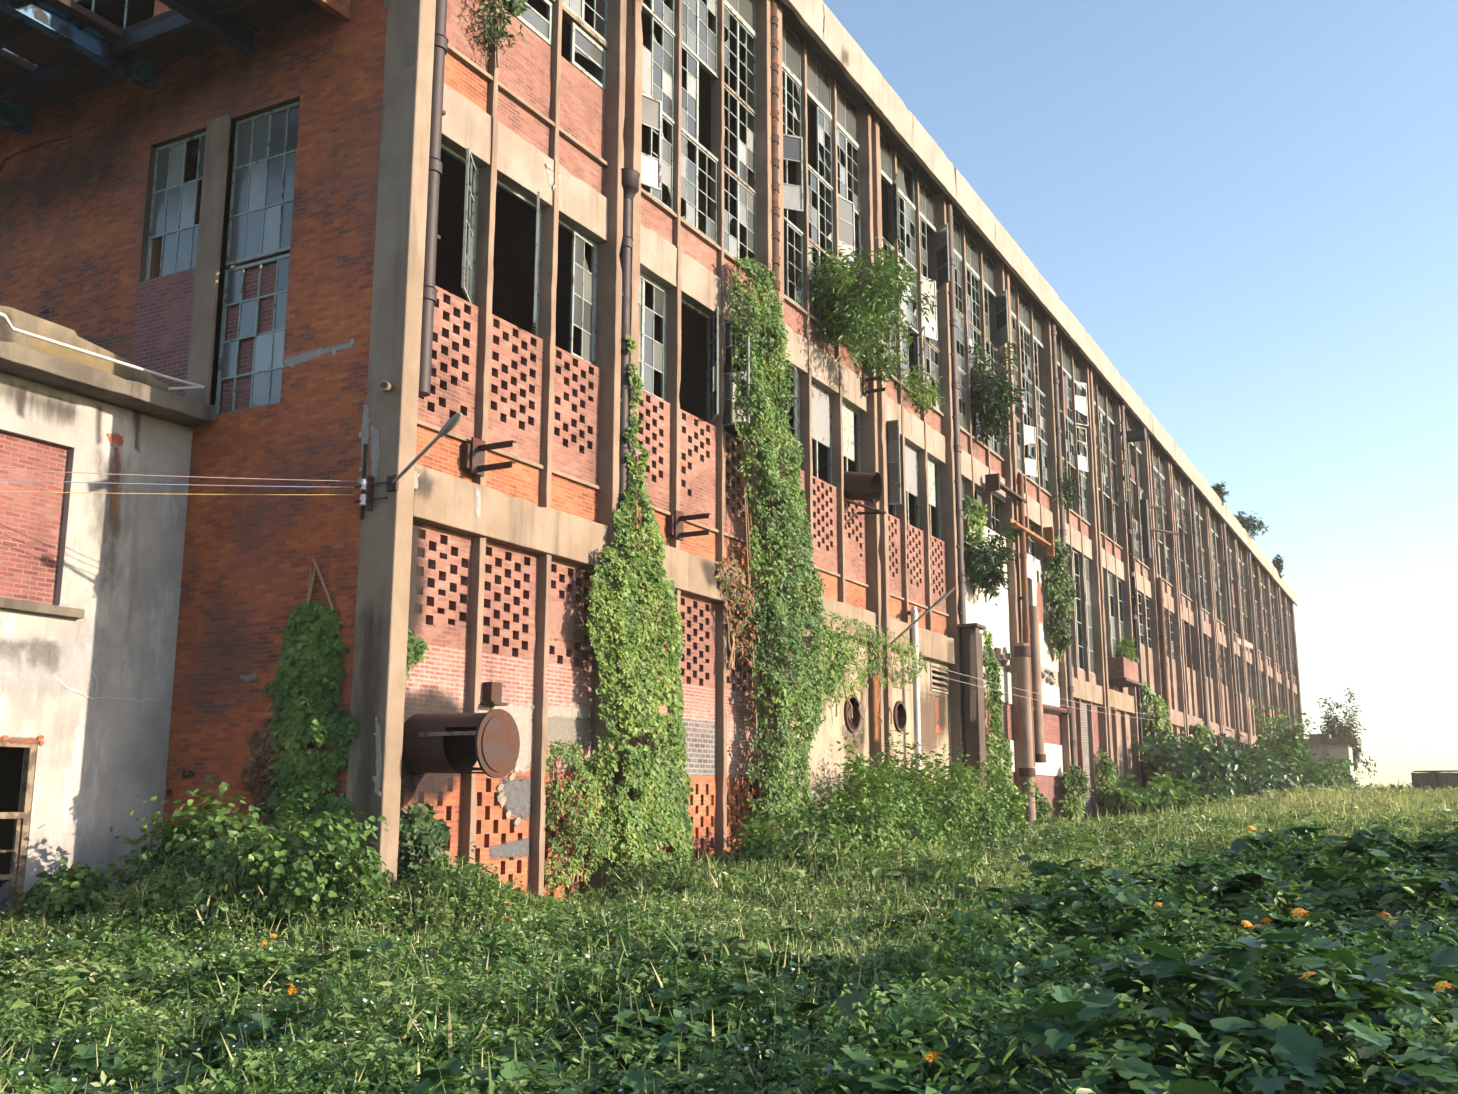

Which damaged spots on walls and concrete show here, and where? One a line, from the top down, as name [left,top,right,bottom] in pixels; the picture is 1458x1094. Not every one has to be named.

damp [8,386,75,419]
damp [96,460,117,563]
corrosion [112,448,120,527]
spalling [490,764,534,858]